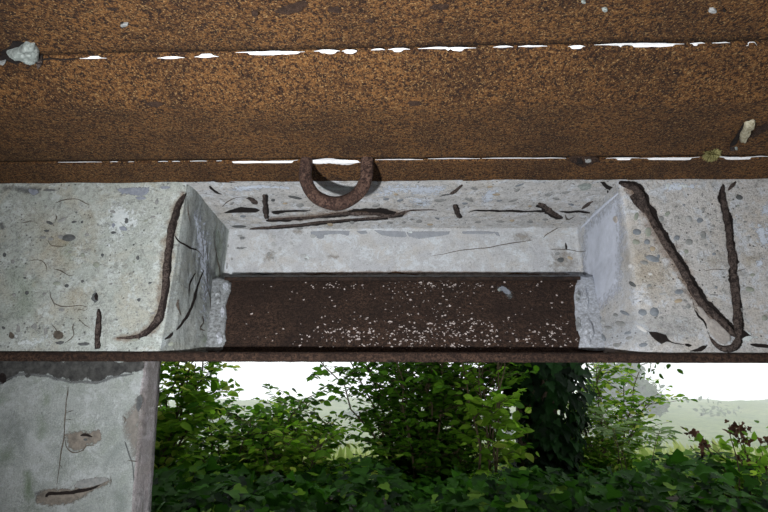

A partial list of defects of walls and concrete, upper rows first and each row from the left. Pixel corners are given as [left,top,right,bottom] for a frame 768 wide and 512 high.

corrosion [275,0,308,15]
spalling [39,217,91,257]
peeling [93,187,159,268]
spalling [117,193,220,341]
spalling [222,182,524,259]
spalling [527,181,768,353]
leakage [0,361,144,384]
crack [57,390,73,481]
spalling [64,429,101,453]
spalling [36,477,112,506]